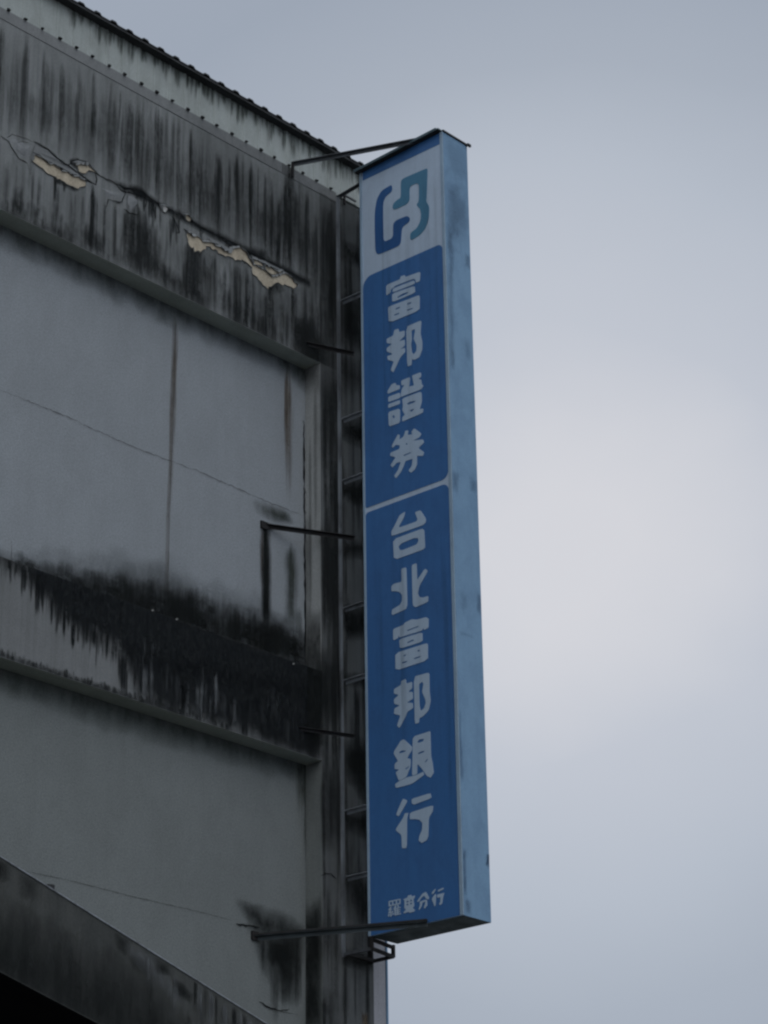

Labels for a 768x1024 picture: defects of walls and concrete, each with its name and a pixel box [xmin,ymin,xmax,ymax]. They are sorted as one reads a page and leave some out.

peeling [31,145,95,189]
water stain [87,192,105,246]
crack [1,134,308,282]
water stain [120,160,360,318]
peeling [182,213,298,290]
water stain [345,301,361,343]
crack [27,328,306,662]
water stain [323,391,363,531]
water stain [1,530,366,791]
water stain [323,784,367,856]
crack [26,871,260,929]
water stain [253,910,326,1024]